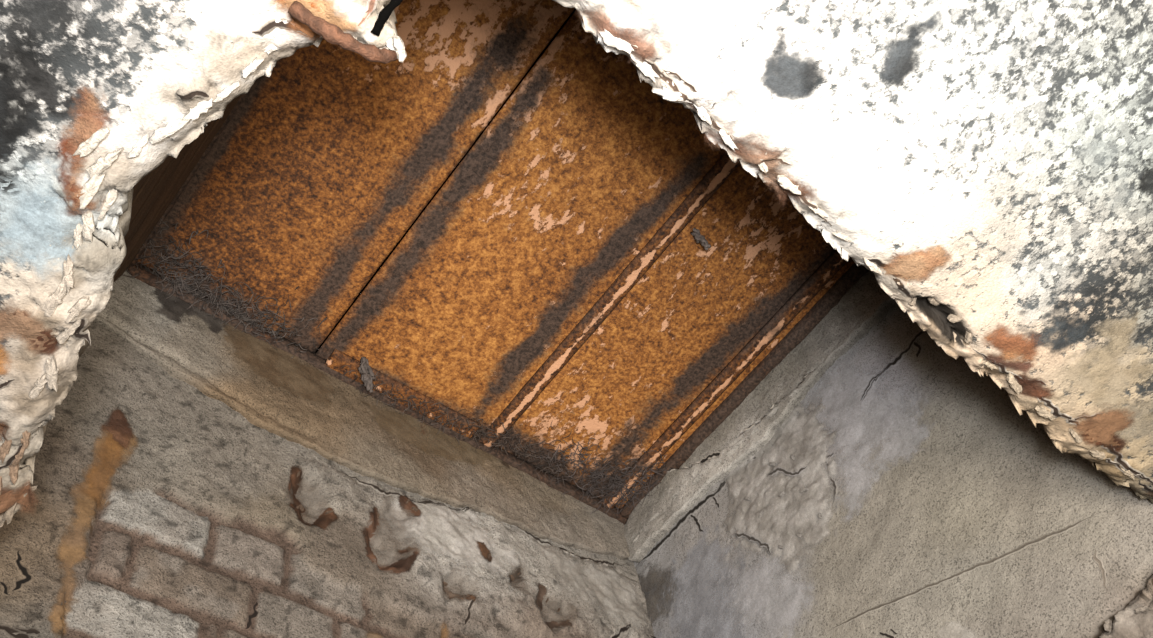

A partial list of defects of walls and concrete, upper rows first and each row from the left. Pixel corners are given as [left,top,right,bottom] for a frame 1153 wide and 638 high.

corrosion [586,11,655,60]
mould [883,14,940,85]
flaking render [599,29,739,151]
leakage [0,71,83,271]
corrosion [60,88,108,215]
flaking render [29,44,279,399]
spalling [909,294,973,347]
corrosion [985,327,1051,398]
crack [973,349,1100,426]
mould [1029,303,1089,352]
crack [0,551,33,595]
crack [1091,550,1153,638]